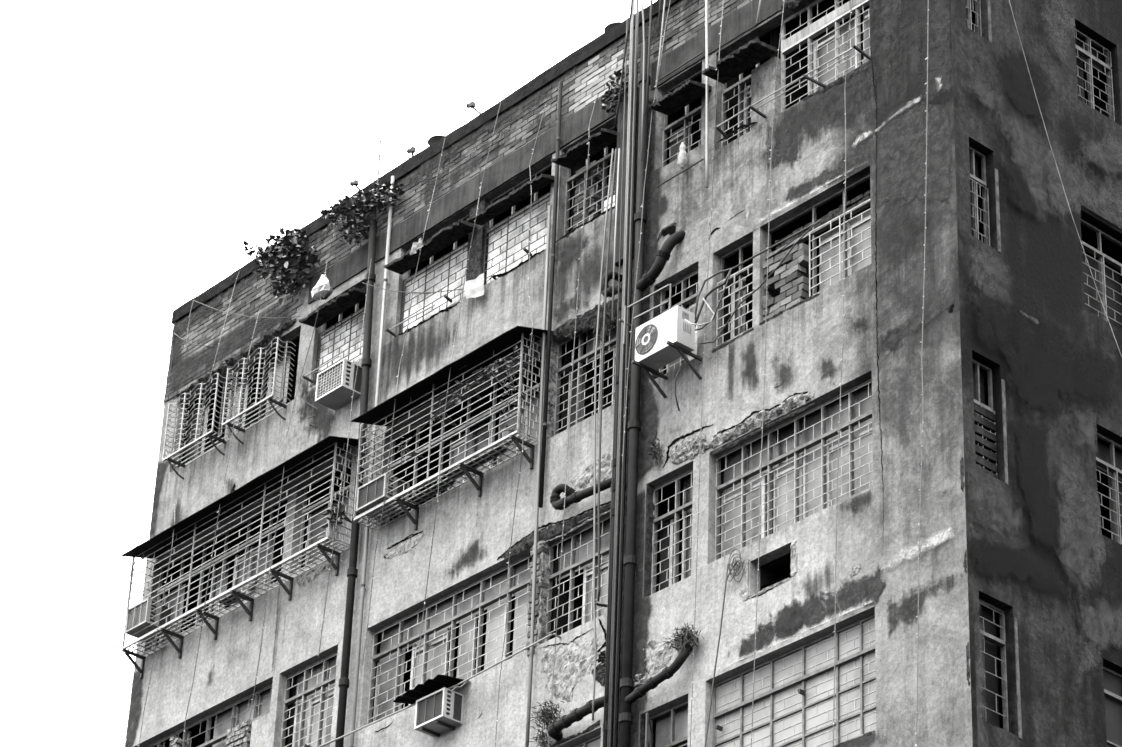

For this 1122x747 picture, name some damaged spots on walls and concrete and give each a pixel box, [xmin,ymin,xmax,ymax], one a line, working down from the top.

damp [764,0,952,218]
damp [728,341,758,393]
damp [773,356,793,390]
damp [821,359,840,384]
spalling [670,391,814,465]
damp [739,565,954,661]